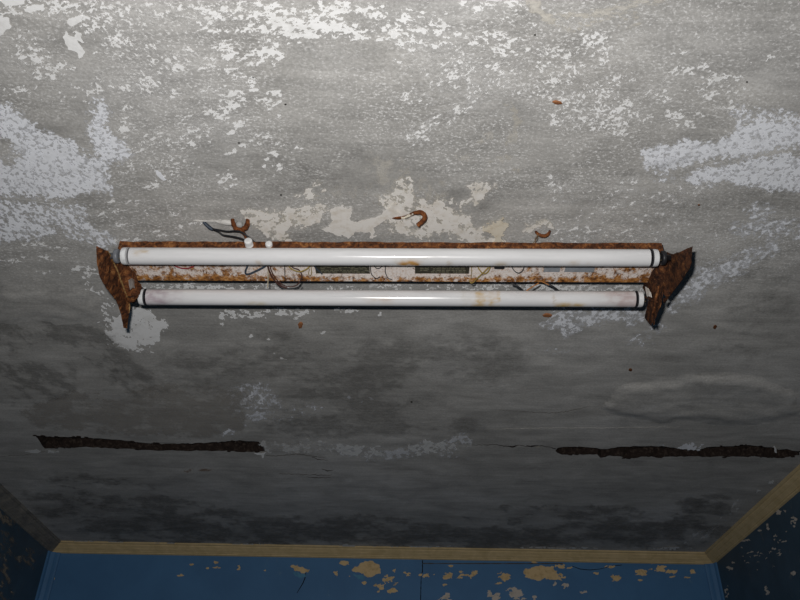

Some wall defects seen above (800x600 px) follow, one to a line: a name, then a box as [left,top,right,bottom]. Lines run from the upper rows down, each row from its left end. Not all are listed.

peeling [645,85,705,130]
peeling [668,63,748,110]
peeling [0,0,654,278]
peeling [640,111,800,193]
peeling [101,306,169,353]
peeling [726,509,797,570]
peeling [333,561,478,600]
peeling [487,572,537,600]
peeling [523,561,572,589]
peeling [635,565,695,581]